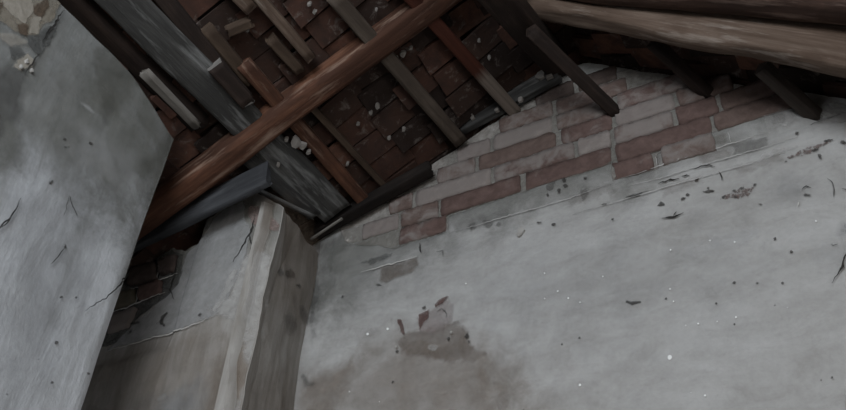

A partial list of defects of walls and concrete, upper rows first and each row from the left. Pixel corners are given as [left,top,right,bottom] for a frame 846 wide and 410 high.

flaking render [0,0,65,74]
crack [0,198,21,228]
flaking render [340,65,846,286]
crack [87,275,128,310]
flaking render [102,201,259,351]
flaking render [243,253,270,361]